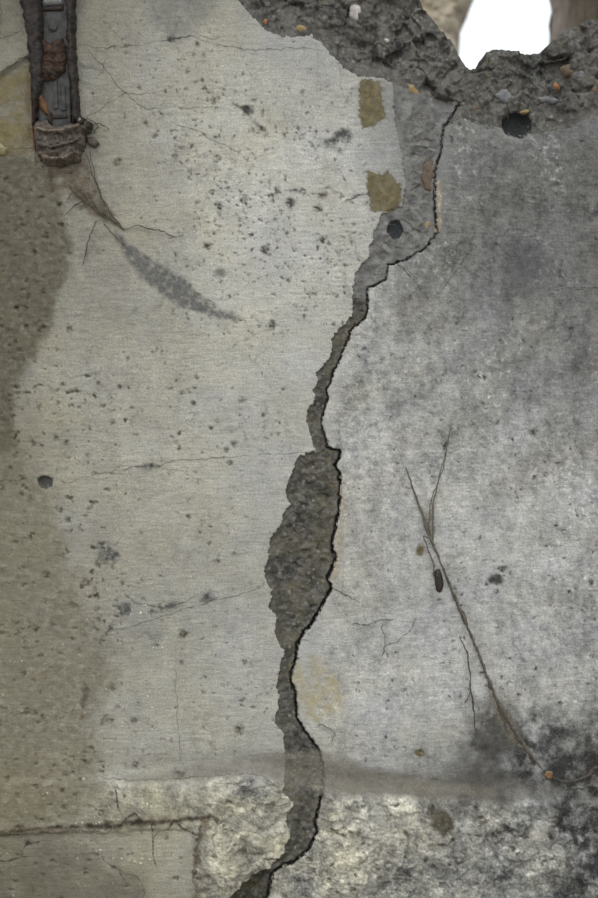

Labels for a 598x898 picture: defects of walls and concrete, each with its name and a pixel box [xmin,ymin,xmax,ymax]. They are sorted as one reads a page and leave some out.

damp [0,70,70,450]
corrosion [30,75,53,154]
corrosion [42,38,67,82]
crack [265,104,458,898]
spalling [231,0,598,898]
damp [460,713,598,898]